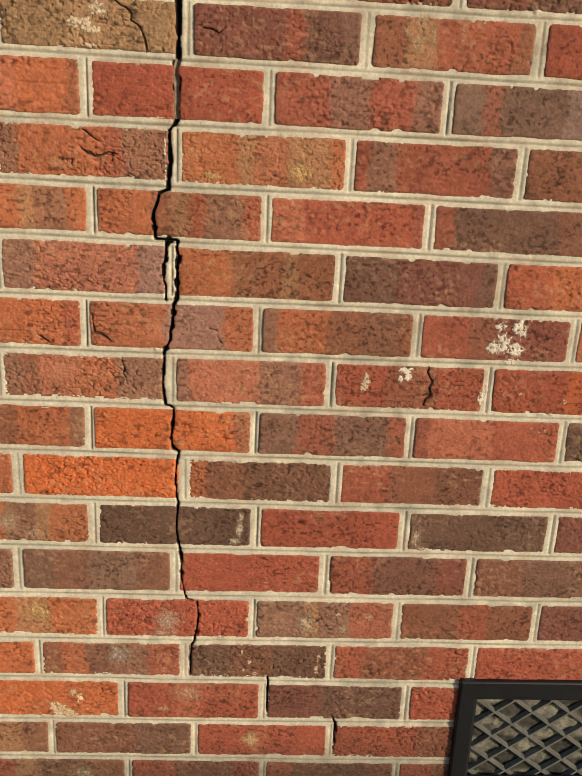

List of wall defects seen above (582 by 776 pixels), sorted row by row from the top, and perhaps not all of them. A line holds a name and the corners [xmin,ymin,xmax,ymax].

crack [113,0,147,53]
crack [151,0,199,672]
crack [422,366,436,405]
crack [263,676,271,711]